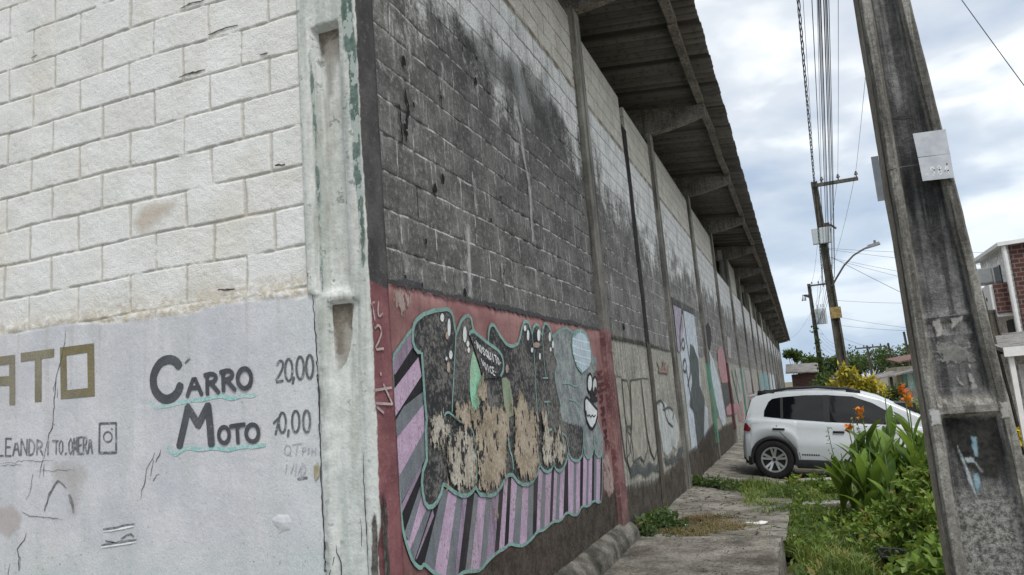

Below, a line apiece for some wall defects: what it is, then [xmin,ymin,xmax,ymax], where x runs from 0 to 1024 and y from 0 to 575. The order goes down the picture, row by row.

peeling [308,53,317,143]
peeling [341,0,365,265]
leakage [400,88,410,146]
leakage [473,47,559,241]
crack [2,331,71,571]
peeling [430,372,566,494]
leakage [475,124,742,575]